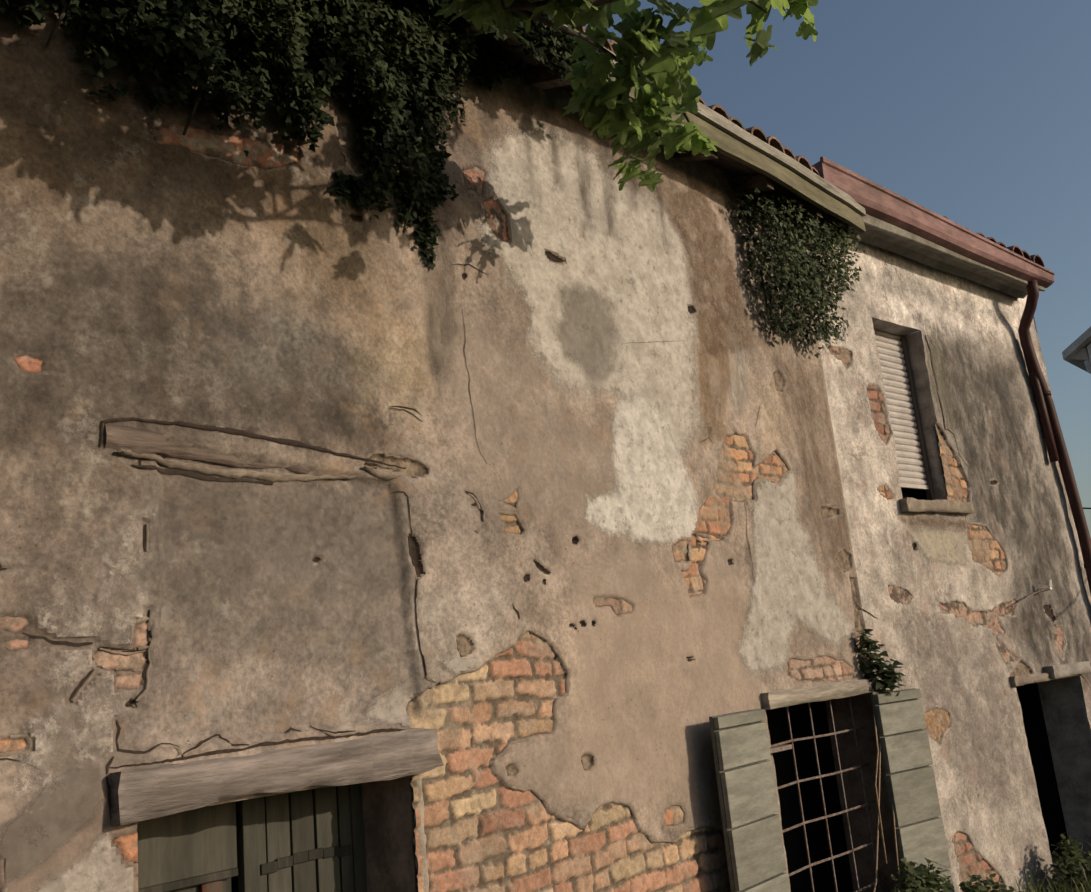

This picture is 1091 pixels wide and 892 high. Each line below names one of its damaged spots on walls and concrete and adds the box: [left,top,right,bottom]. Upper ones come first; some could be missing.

flaking render [150,120,300,172]
peeling [462,127,865,684]
flaking render [935,425,971,503]
crack [142,524,150,551]
crack [392,491,412,539]
flaking render [92,616,152,708]
crack [415,579,436,683]
flaking render [938,598,1033,677]
crack [23,610,405,819]
flaking render [406,629,731,892]
peeling [38,832,138,892]
flaking render [952,830,1007,892]